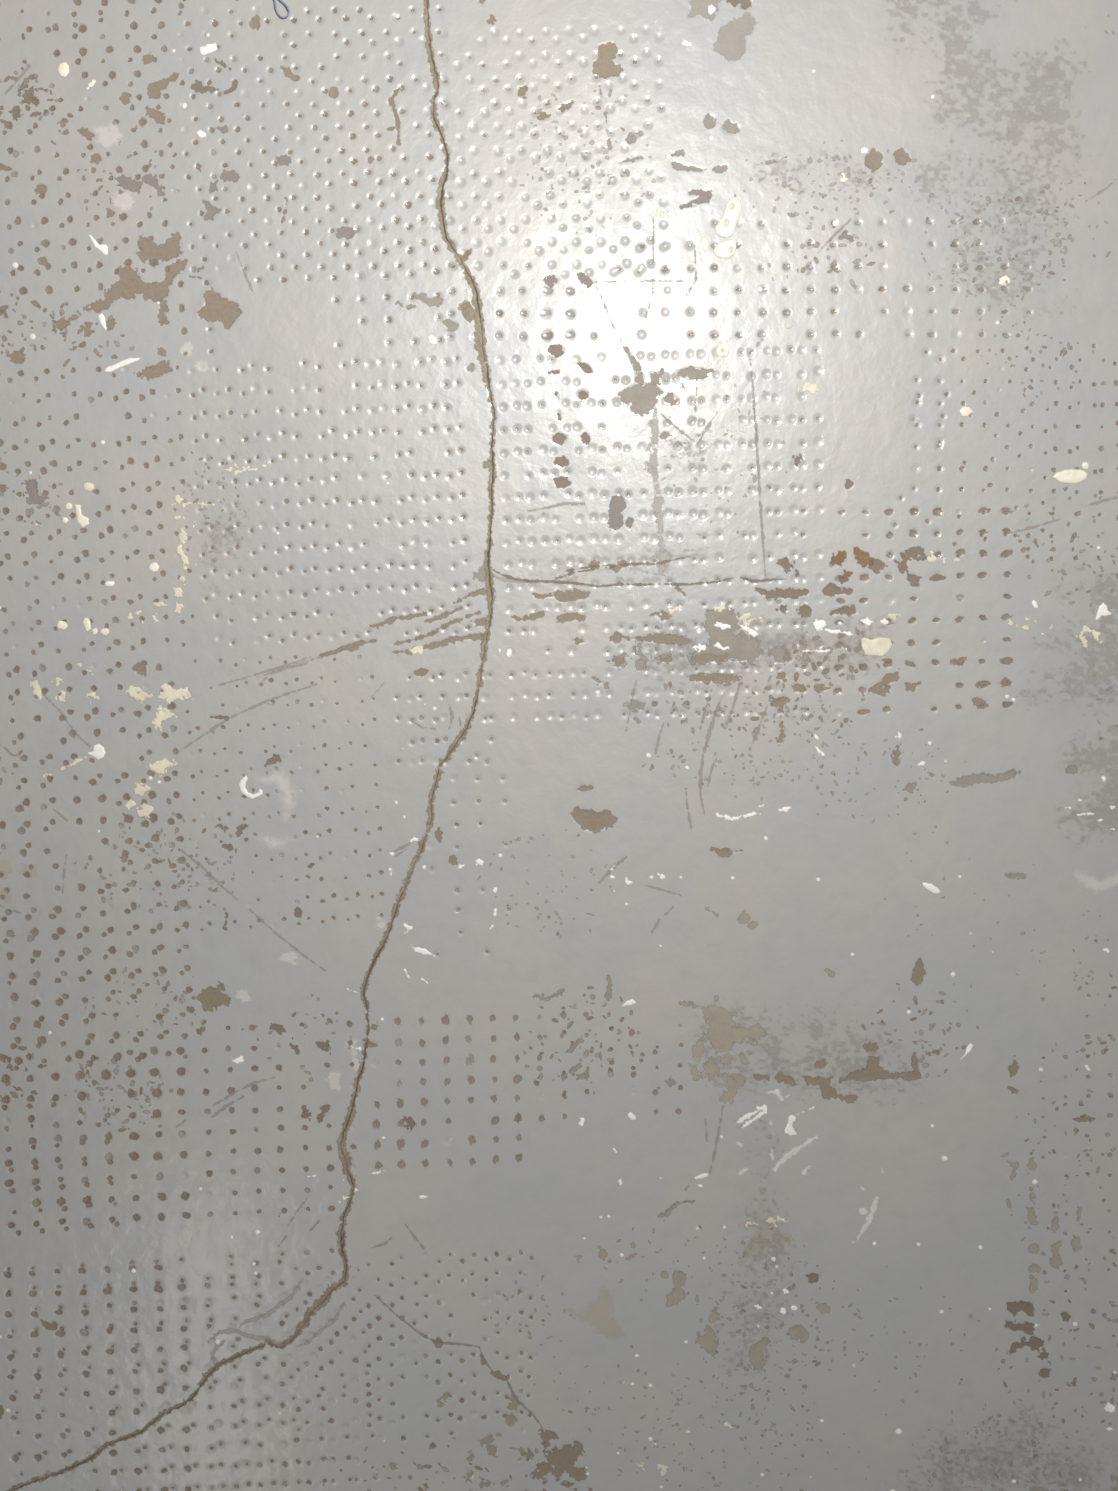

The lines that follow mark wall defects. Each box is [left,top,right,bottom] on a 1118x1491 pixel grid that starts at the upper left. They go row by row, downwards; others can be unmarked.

peeling [520,0,1118,829]
peeling [0,0,487,1236]
peeling [507,588,590,645]
crack [7,0,777,1491]
peeling [478,785,618,938]
peeling [710,847,743,858]
peeling [442,958,979,1166]